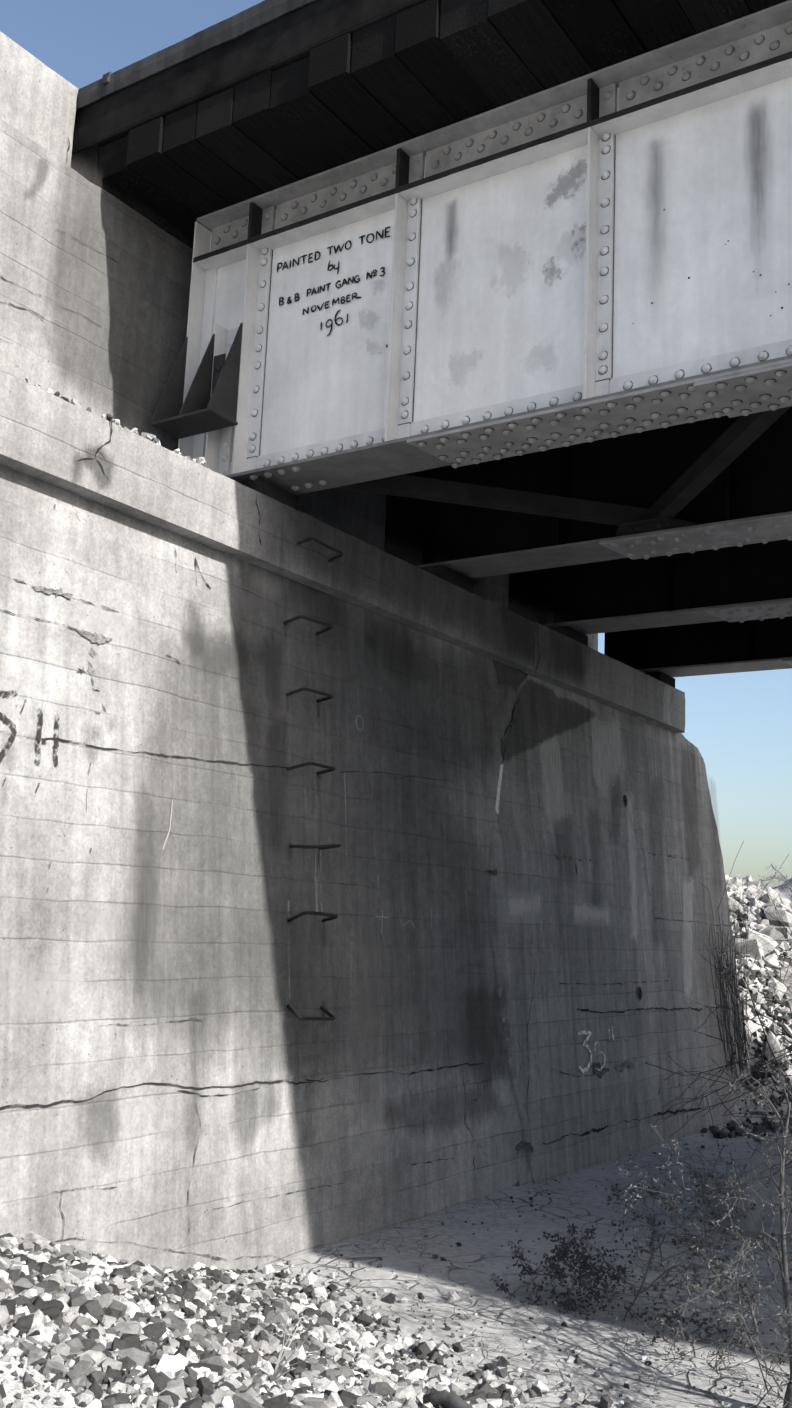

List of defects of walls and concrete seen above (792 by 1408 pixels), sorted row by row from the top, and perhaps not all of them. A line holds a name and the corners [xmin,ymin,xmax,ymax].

crack [78,420,113,479]
crack [5,733,288,768]
crack [501,619,540,762]
crack [101,1018,203,1026]
crack [519,921,706,1145]
crack [0,1063,485,1261]